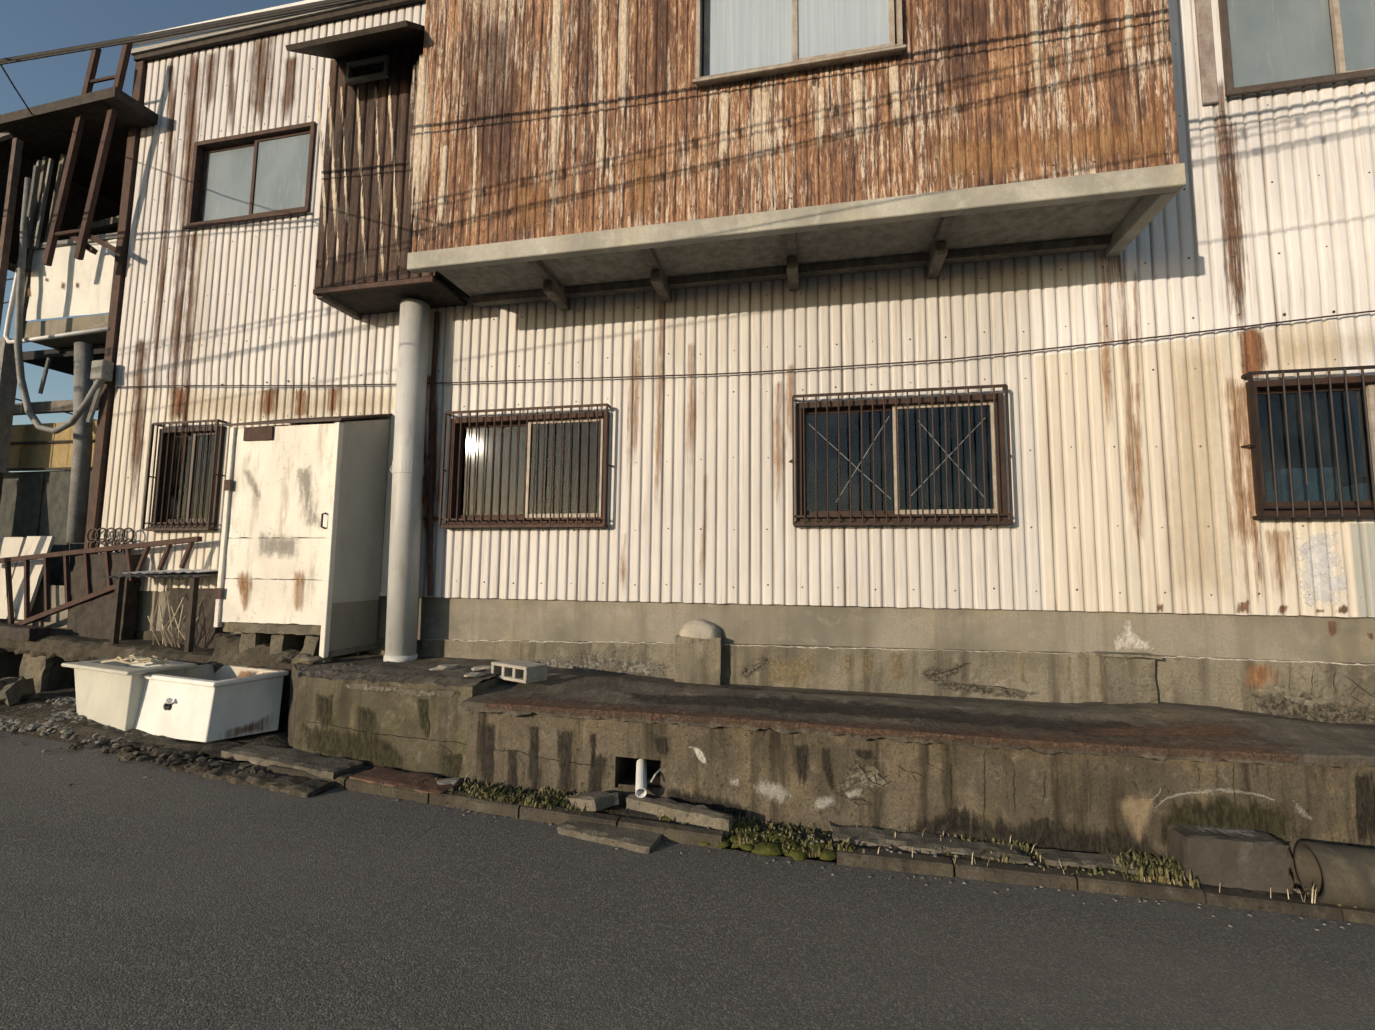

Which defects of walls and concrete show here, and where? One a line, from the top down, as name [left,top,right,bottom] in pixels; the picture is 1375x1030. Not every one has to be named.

rust [463,21,547,226]
rust [130,37,296,495]
rust [1216,85,1285,585]
rust [262,388,310,416]
rust [1102,255,1142,536]
rust [238,574,251,610]
crack [1289,669,1375,704]
water stain [479,725,538,791]
water stain [557,730,572,793]
water stain [587,734,606,792]
water stain [666,789,746,818]
water stain [909,788,1311,858]